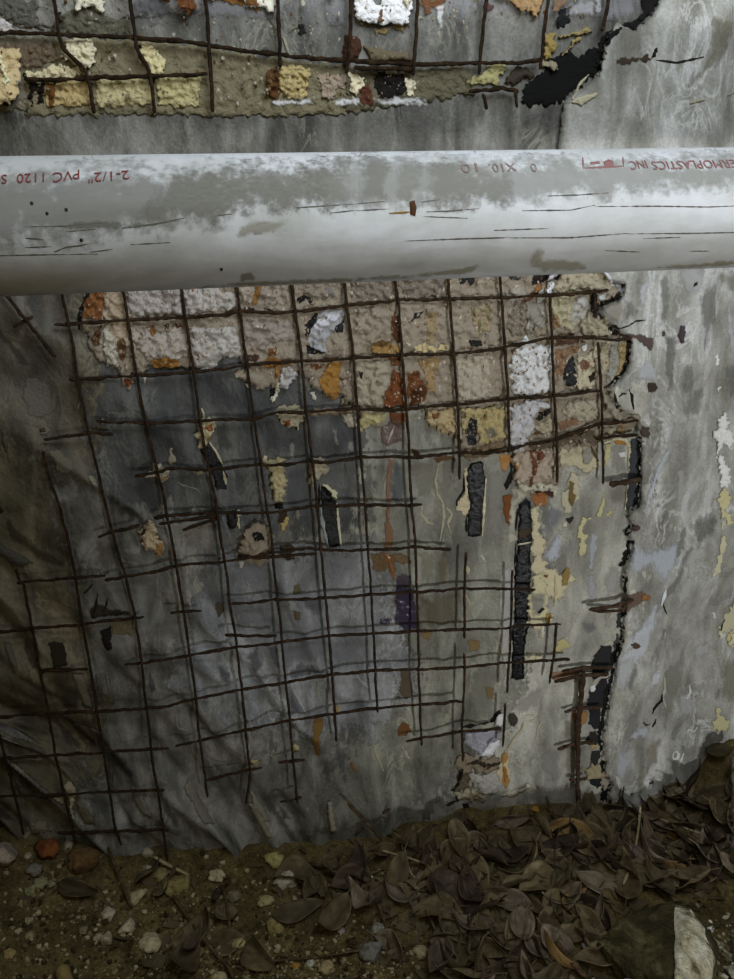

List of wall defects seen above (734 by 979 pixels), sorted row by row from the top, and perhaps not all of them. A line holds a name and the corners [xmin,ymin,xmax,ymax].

flaking render [354,0,413,26]
spalling [0,0,133,106]
flaking render [139,42,166,74]
spalling [373,71,407,100]
spalling [521,8,612,108]
corrosion [371,312,428,446]
corrosion [503,494,512,525]
corrosion [530,450,553,507]
corrosion [568,481,576,506]
spalling [582,599,634,805]
corrosion [552,665,613,804]
corrosion [467,753,510,789]